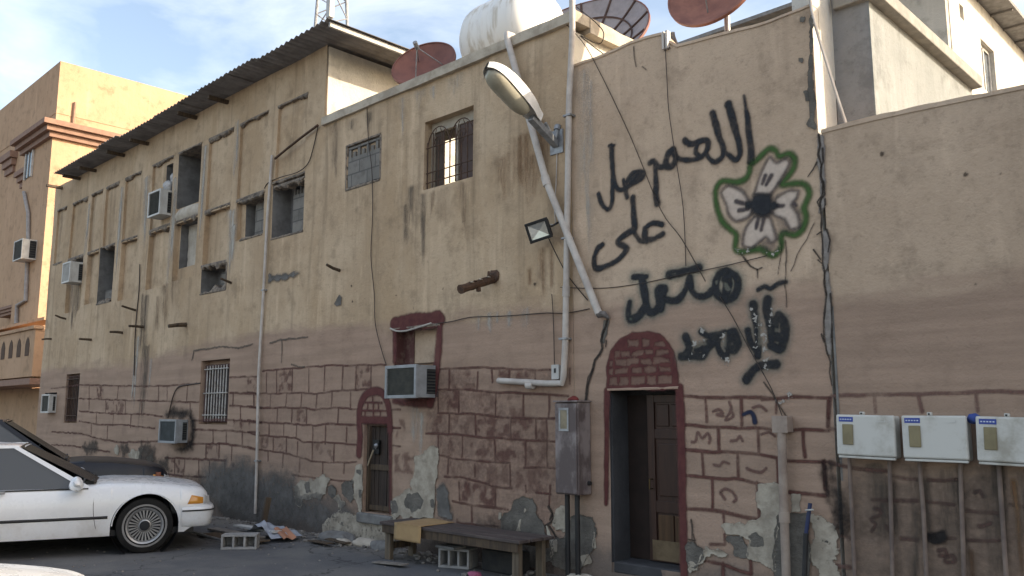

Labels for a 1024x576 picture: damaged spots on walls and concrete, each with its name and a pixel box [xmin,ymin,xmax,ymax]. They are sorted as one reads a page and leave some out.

flaking render [294,464,395,541]
peeling [390,445,439,520]
flaking render [498,496,597,570]
peeling [685,482,840,576]